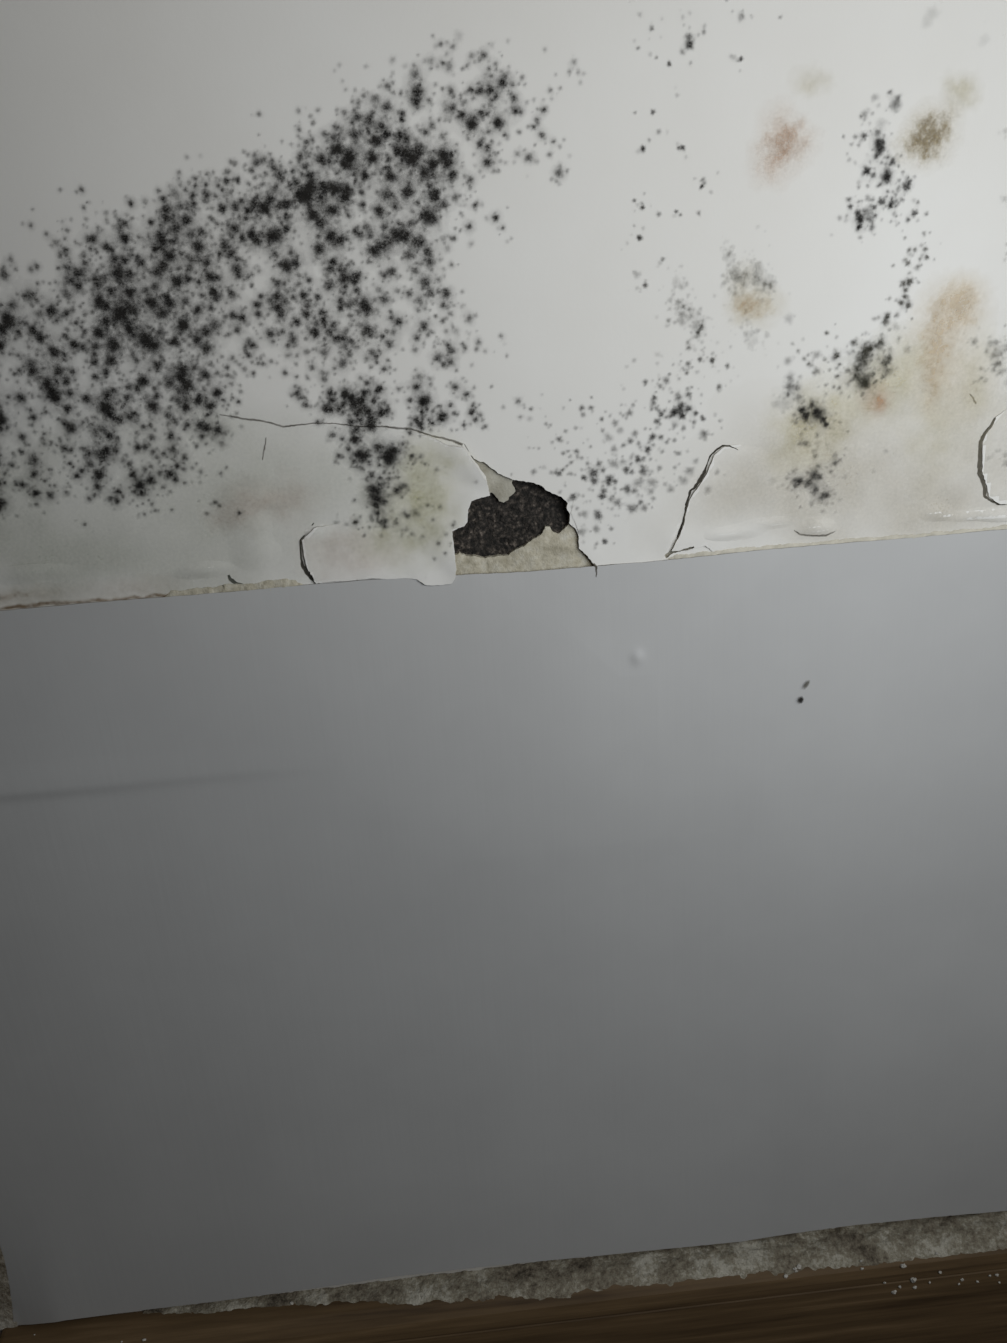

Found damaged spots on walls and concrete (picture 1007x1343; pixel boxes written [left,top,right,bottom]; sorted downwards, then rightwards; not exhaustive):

leakage [448,53,522,166]
leakage [849,134,910,230]
leakage [0,72,486,528]
crack [299,523,315,583]
crack [225,415,463,460]
peeling [165,431,1007,597]
leakage [582,394,705,518]
crack [665,445,736,558]
leakage [798,402,829,432]
leakage [834,341,891,387]
crack [970,394,1004,505]
flaking render [0,1247,18,1331]